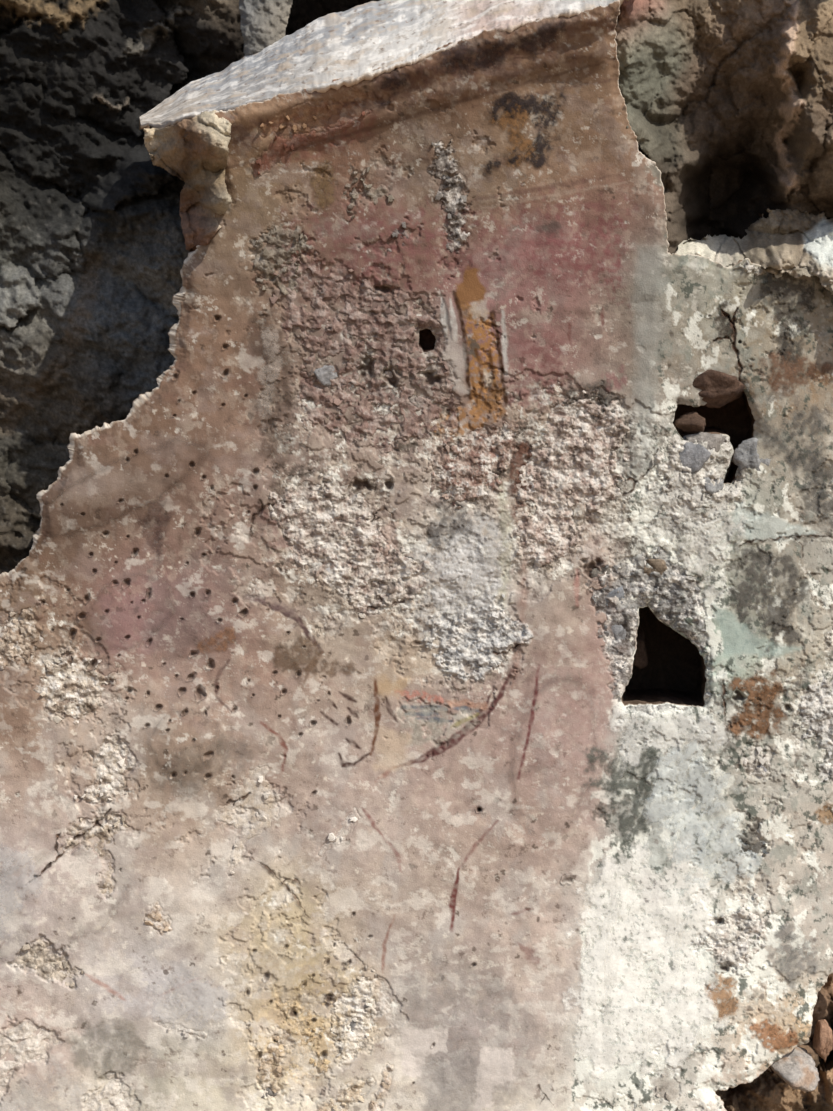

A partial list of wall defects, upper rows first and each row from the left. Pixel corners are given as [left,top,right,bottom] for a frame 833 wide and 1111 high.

spalling [247,222,714,715]
spalling [646,369,771,524]
crack [32,808,115,881]
spalling [0,1017,62,1101]
spalling [82,1071,140,1111]